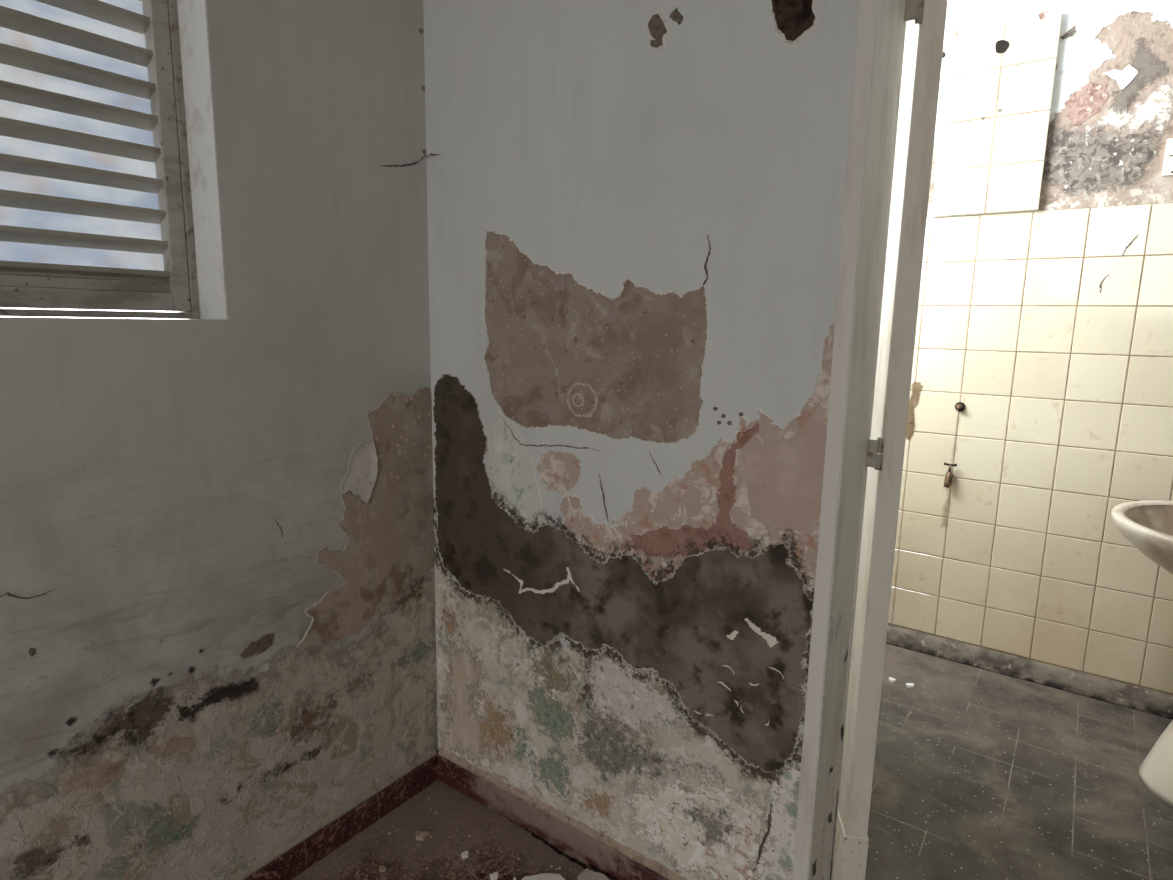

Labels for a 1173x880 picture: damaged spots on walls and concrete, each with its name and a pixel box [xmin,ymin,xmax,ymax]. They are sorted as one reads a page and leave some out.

spalling [646,8,683,51]
spalling [770,0,819,45]
flaking render [1036,7,1173,212]
crack [380,153,440,167]
flaking render [927,138,937,216]
rust [906,382,923,440]
flaking render [0,229,835,880]
water stain [47,664,381,784]